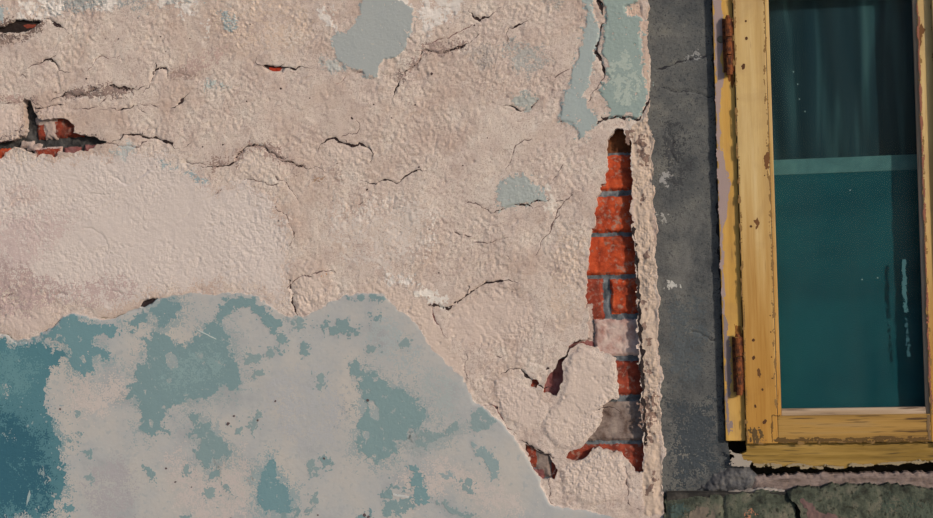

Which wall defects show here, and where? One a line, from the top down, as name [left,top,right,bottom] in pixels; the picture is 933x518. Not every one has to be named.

spalling [0,4,41,33]
peeling [330,0,419,79]
crack [393,7,528,106]
flaking render [0,99,106,159]
crack [3,55,427,246]
peeling [494,172,547,213]
crack [287,270,336,315]
crack [428,194,573,338]
flaking render [531,0,663,517]
peeling [0,281,500,518]
flaking render [526,444,558,479]
peeling [729,450,933,469]